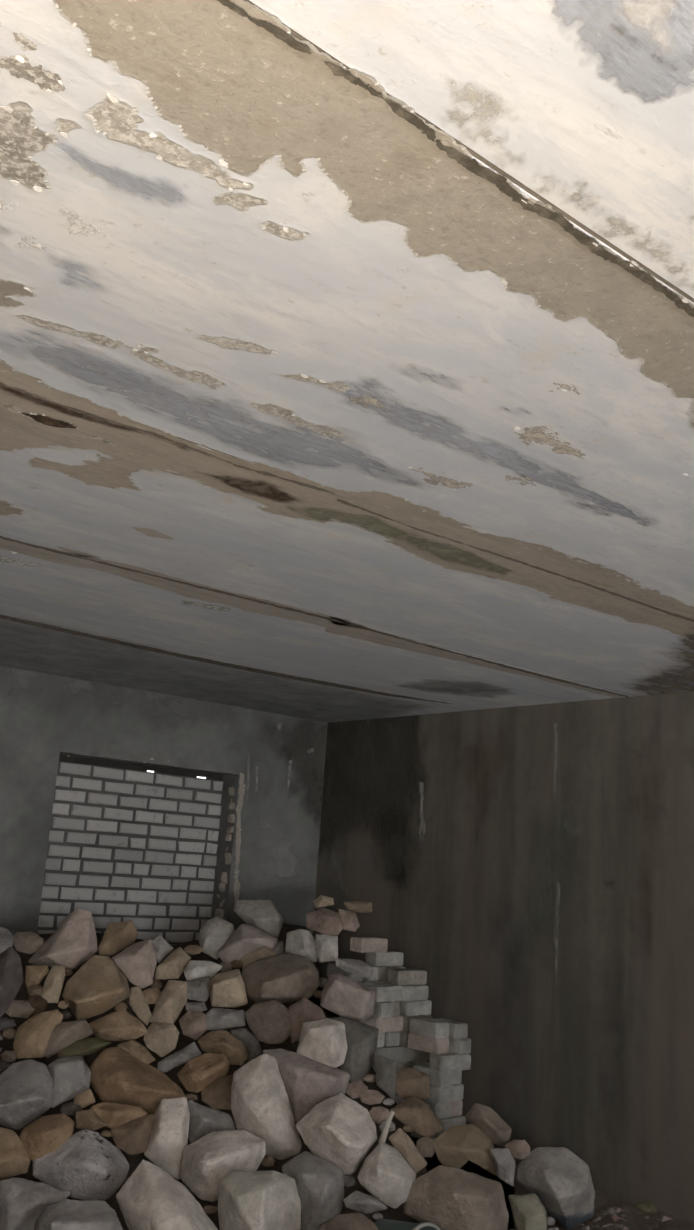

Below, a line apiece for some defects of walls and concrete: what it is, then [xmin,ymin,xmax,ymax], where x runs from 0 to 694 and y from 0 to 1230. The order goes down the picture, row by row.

water stain [554,0,694,102]
peeling [0,0,694,428]
water stain [15,338,382,474]
peeling [0,359,694,642]
water stain [342,382,650,523]
peeling [0,536,625,698]
water stain [631,635,694,695]
water stain [265,715,426,880]